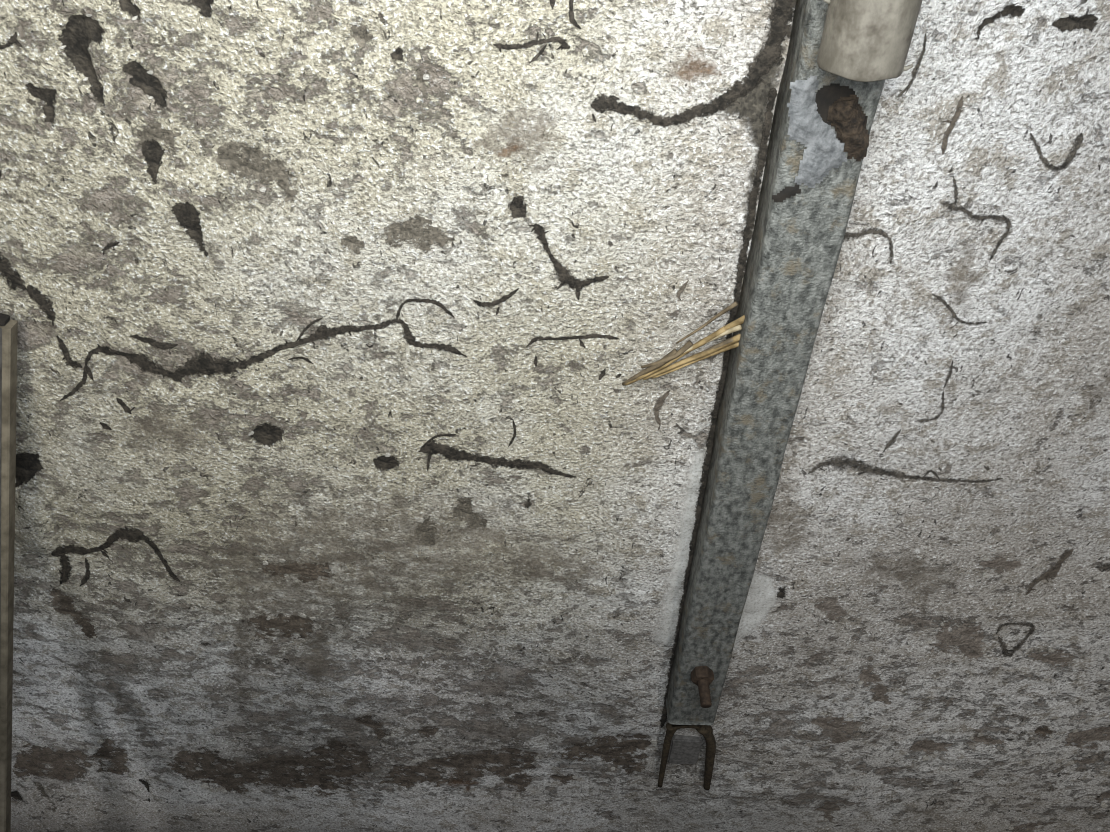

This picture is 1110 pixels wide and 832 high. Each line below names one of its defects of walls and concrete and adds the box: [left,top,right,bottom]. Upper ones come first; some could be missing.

crack [102,241,120,255]
crack [528,223,609,300]
crack [0,252,519,401]
crack [590,0,797,728]
crack [100,398,135,430]
crack [418,420,577,478]
crack [808,361,1003,483]
crack [51,525,180,586]
damp [223,503,591,616]
crack [1026,549,1074,595]
crack [1095,563,1110,572]
crack [996,622,1035,656]